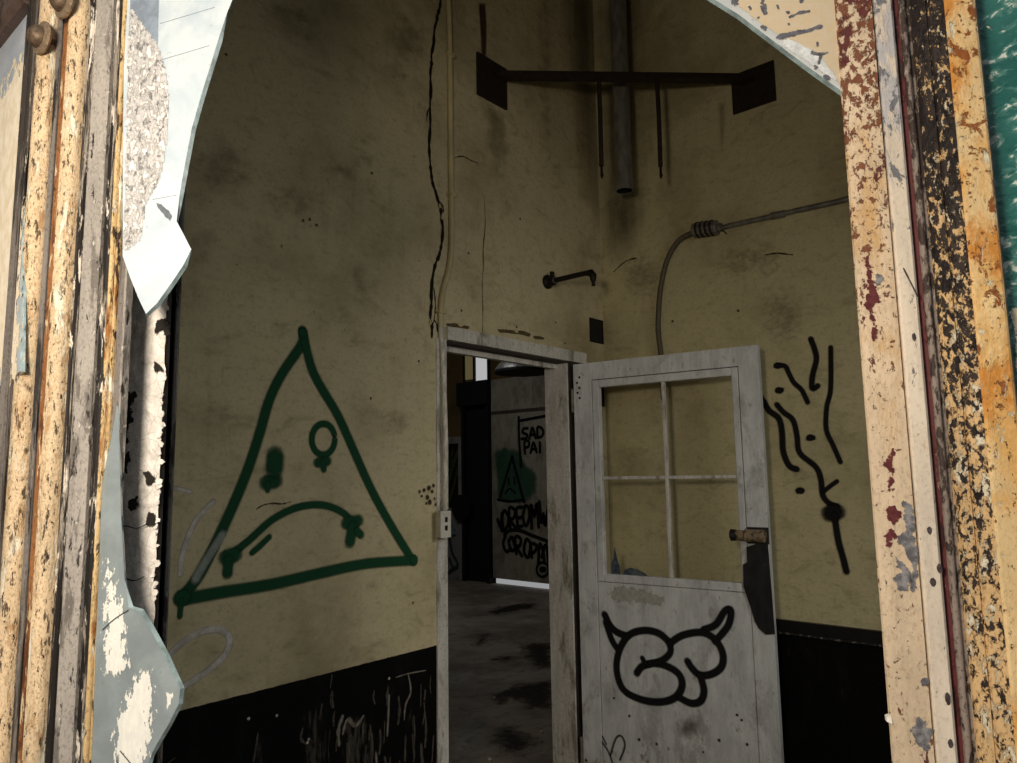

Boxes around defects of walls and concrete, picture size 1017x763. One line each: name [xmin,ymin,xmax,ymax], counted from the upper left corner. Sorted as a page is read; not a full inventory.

crack [426,0,477,338]
spalling [16,206,27,376]
peeling [864,256,884,342]
peeling [883,448,896,492]
peeling [884,501,919,592]
peeling [910,717,934,751]